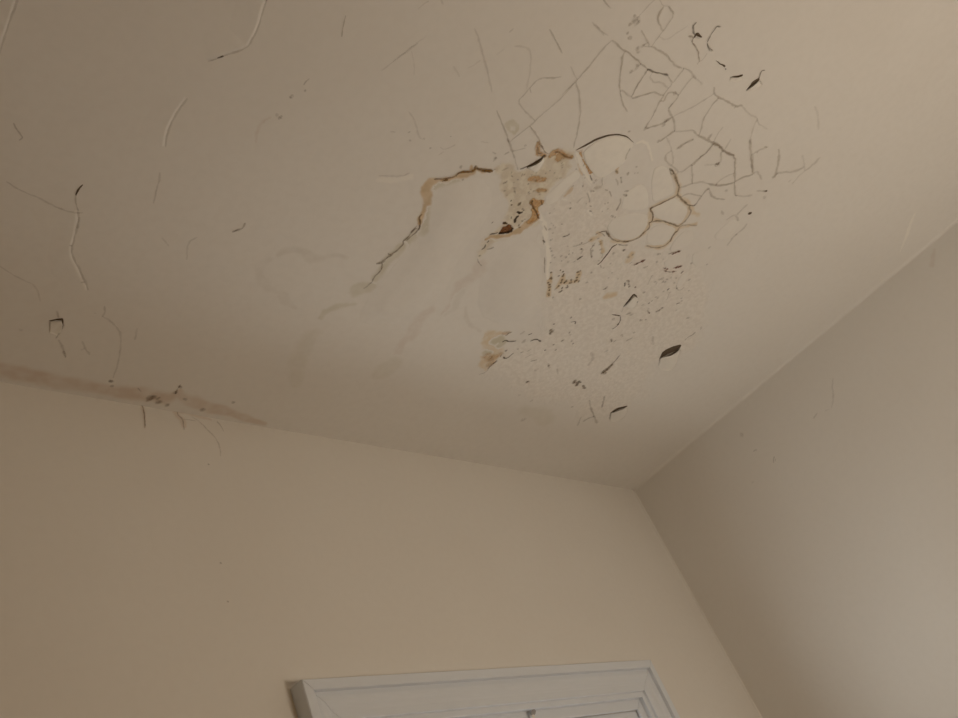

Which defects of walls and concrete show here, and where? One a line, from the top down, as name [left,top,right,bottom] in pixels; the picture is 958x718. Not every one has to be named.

flaking render [475,134,693,268]
peeling [658,345,681,371]